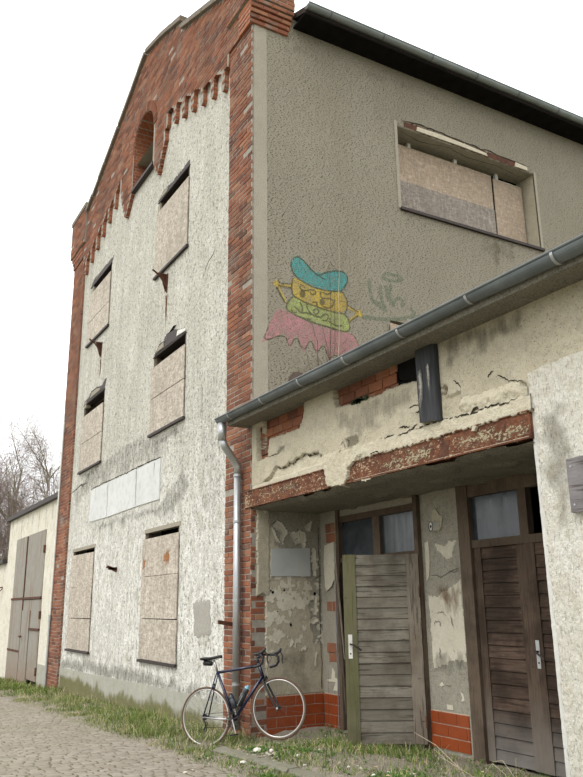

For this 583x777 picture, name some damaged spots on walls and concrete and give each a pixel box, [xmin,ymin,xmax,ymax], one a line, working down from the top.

flaking render [416,127,487,156]
flaking render [260,405,304,459]
flaking render [338,365,399,405]
crack [370,371,521,454]
peeling [455,422,529,449]
flaking render [459,381,530,414]
flaking render [261,453,325,496]
peeling [378,442,435,470]
peeling [424,540,456,580]
peeling [262,510,338,691]
peeling [428,579,467,668]